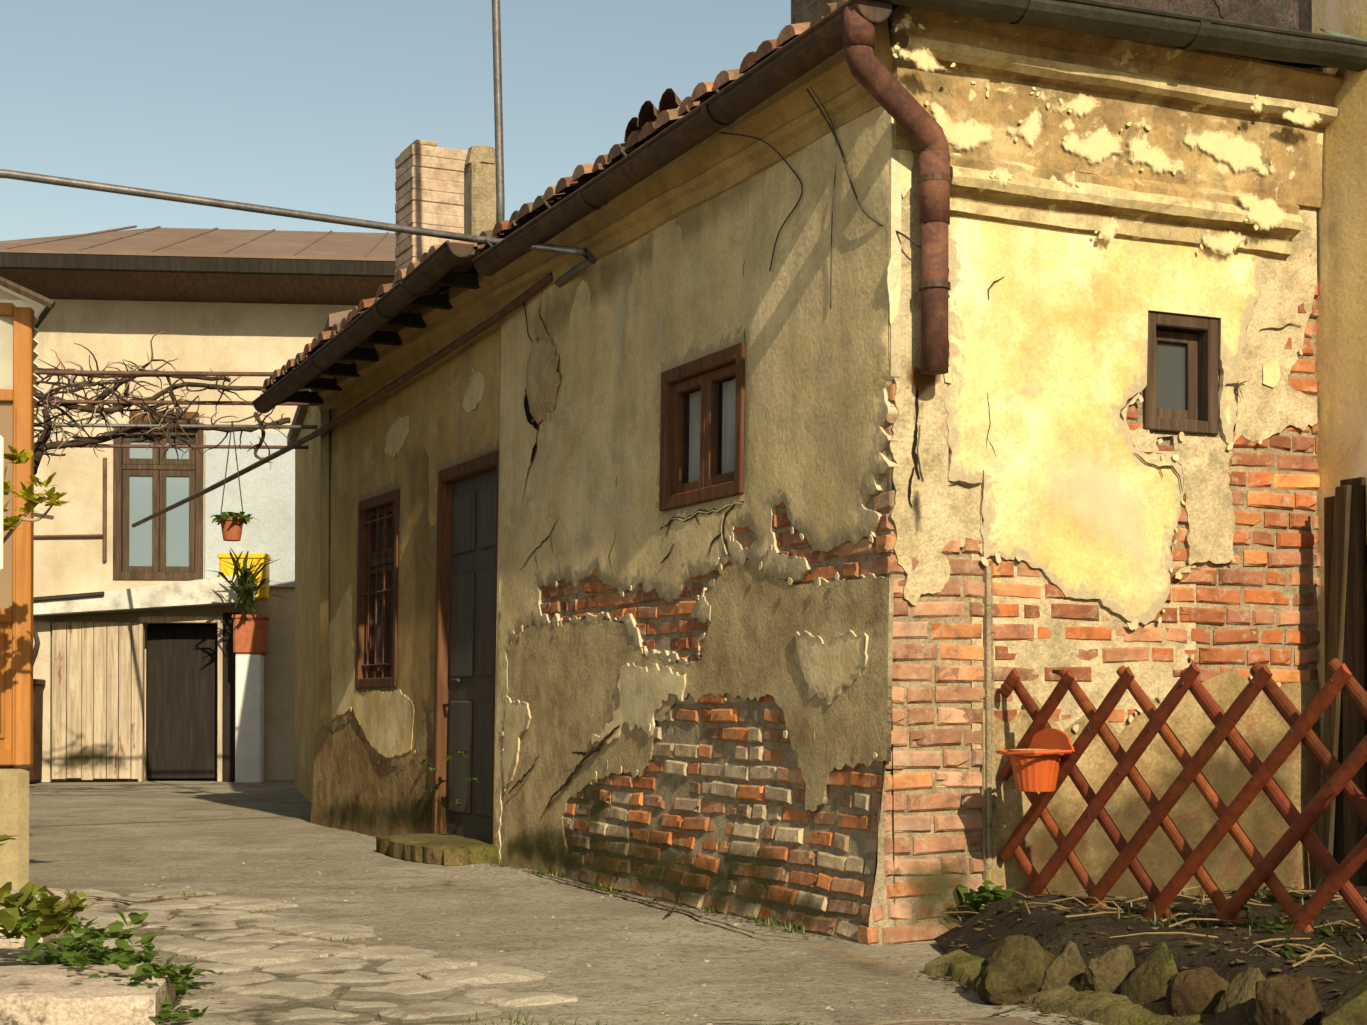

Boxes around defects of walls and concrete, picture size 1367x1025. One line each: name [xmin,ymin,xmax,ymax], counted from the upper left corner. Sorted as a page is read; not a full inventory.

peeling [924,81,1099,149]
peeling [1250,94,1268,111]
peeling [1283,105,1322,126]
peeling [1062,118,1275,187]
flaking render [500,149,1320,945]